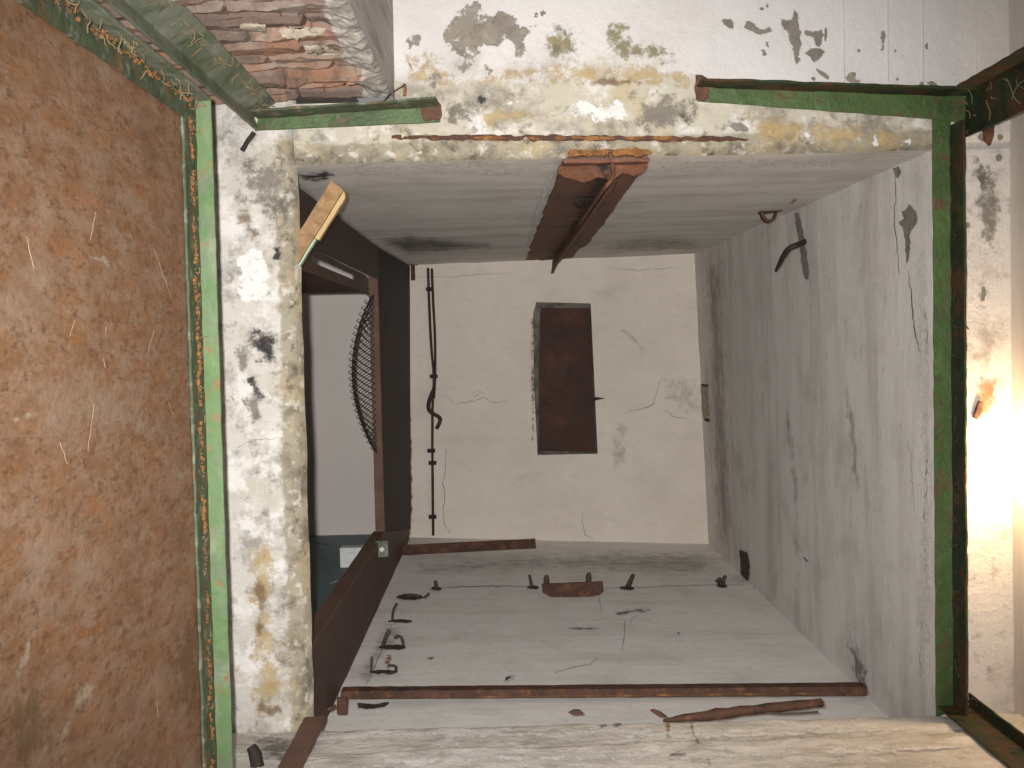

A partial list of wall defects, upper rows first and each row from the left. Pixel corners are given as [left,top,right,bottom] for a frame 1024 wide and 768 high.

peeling [239,23,266,32]
peeling [279,26,344,57]
peeling [406,34,421,49]
peeling [443,1,546,75]
water stain [447,24,695,129]
peeling [722,10,829,81]
water stain [237,161,288,260]
corrosion [557,155,648,183]
flaking render [899,205,917,263]
water stain [973,158,1001,245]
water stain [236,348,264,423]
water stain [250,549,281,714]